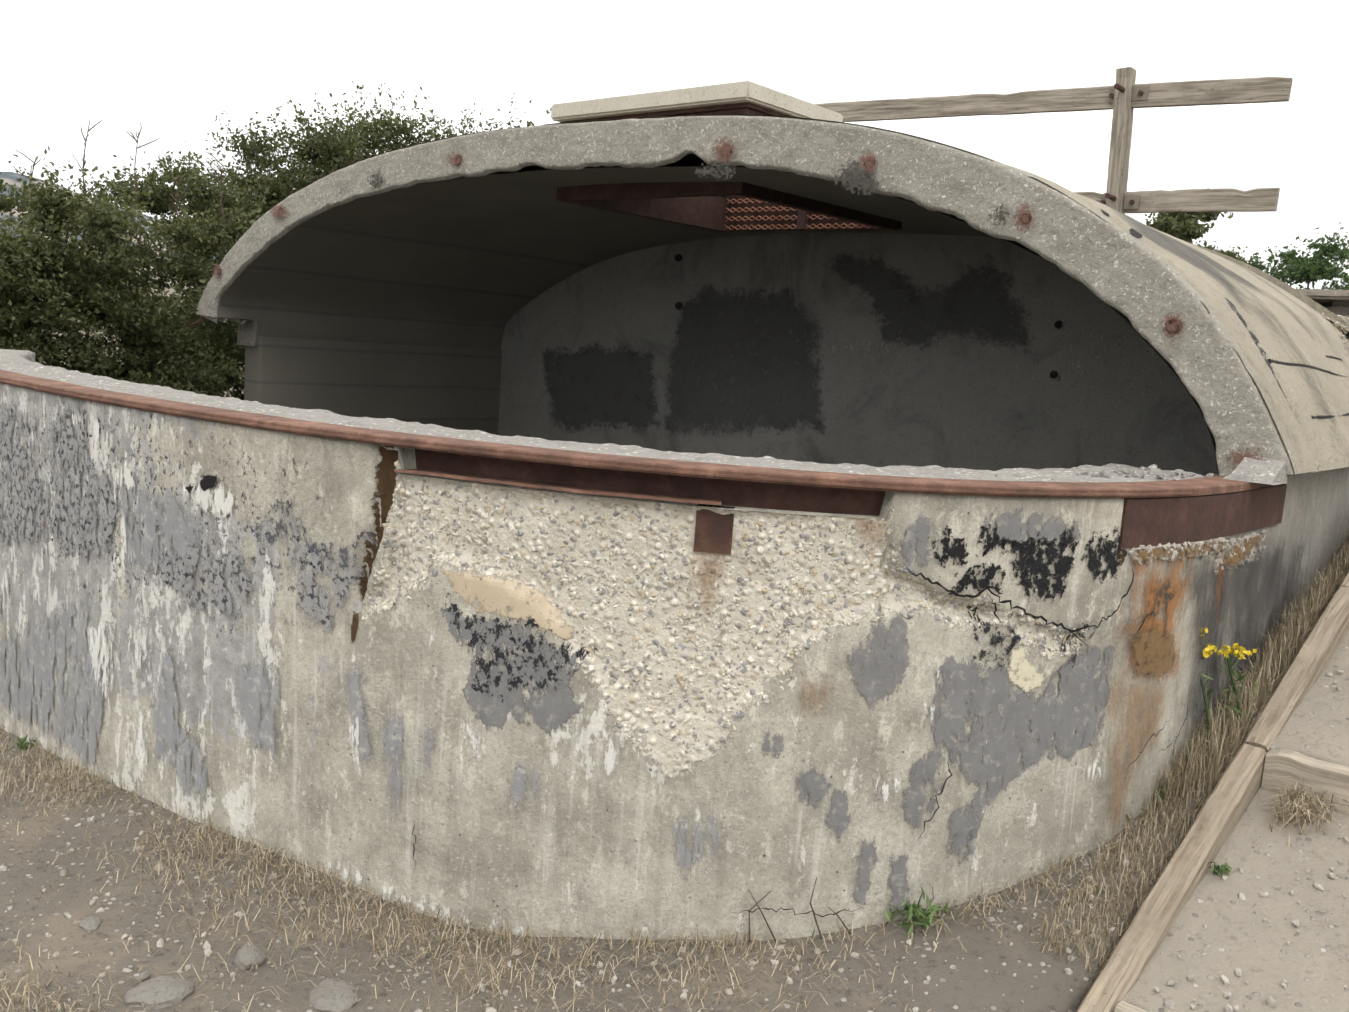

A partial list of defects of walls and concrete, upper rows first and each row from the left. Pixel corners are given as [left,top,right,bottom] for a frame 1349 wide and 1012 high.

rust [1013,203,1036,233]
peeling [0,400,121,563]
spalling [183,484,234,518]
spalling [255,460,1088,778]
crack [904,568,1155,653]
rust [1128,555,1194,675]